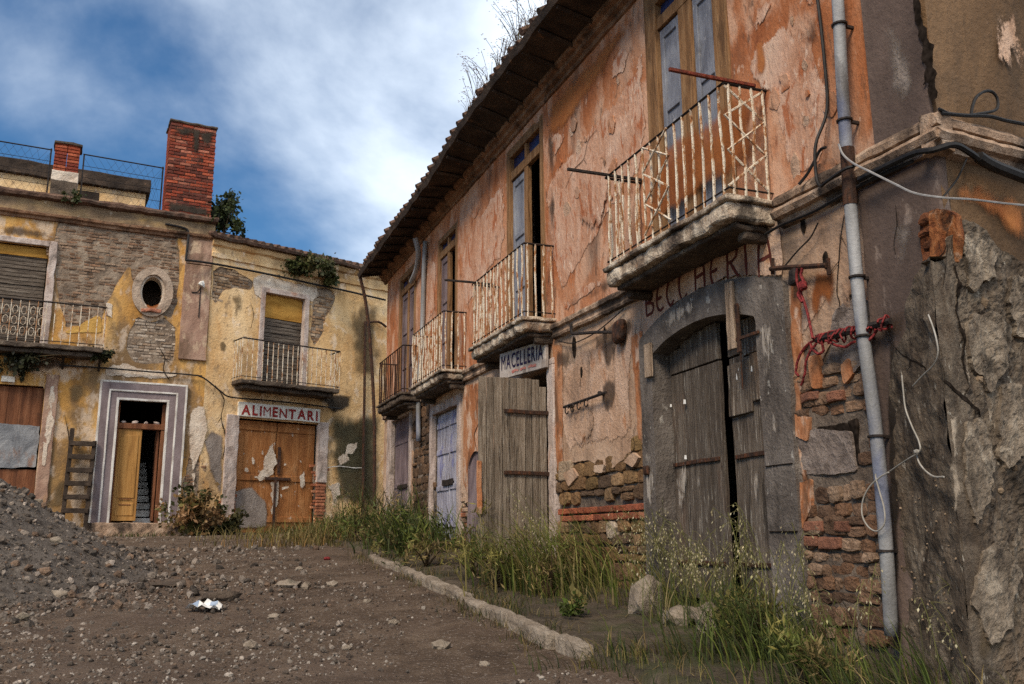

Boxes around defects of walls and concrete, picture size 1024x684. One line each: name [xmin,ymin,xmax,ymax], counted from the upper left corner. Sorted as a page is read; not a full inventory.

crack [913,0,938,101]
peeling [997,16,1024,65]
peeling [546,50,645,287]
spalling [46,223,180,379]
spalling [210,267,335,345]
peeling [182,406,207,498]
peeling [309,443,357,516]
spalling [555,325,653,590]
spalling [793,251,902,667]